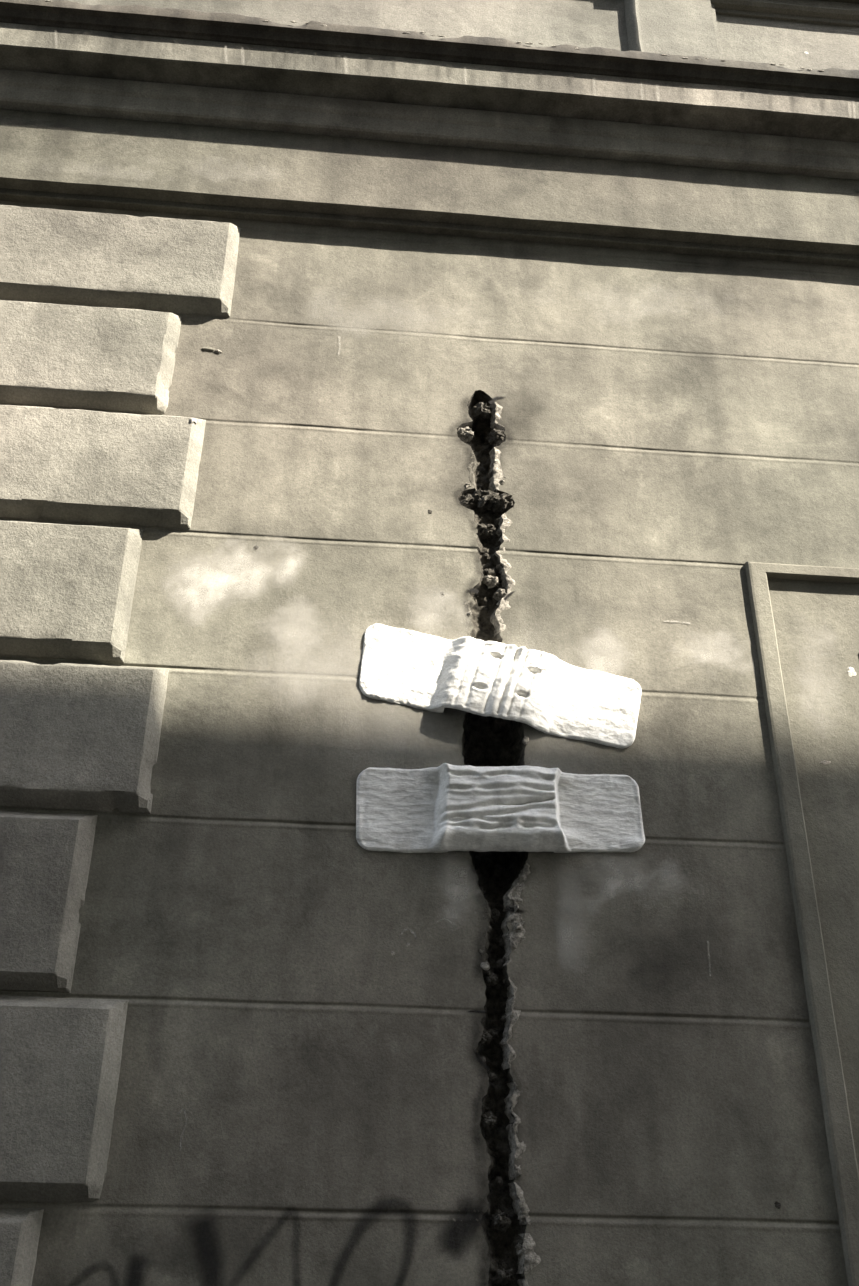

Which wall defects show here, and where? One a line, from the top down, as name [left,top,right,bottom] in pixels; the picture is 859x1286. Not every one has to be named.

crack [457,390,515,643]
crack [462,712,529,767]
crack [468,851,541,1286]